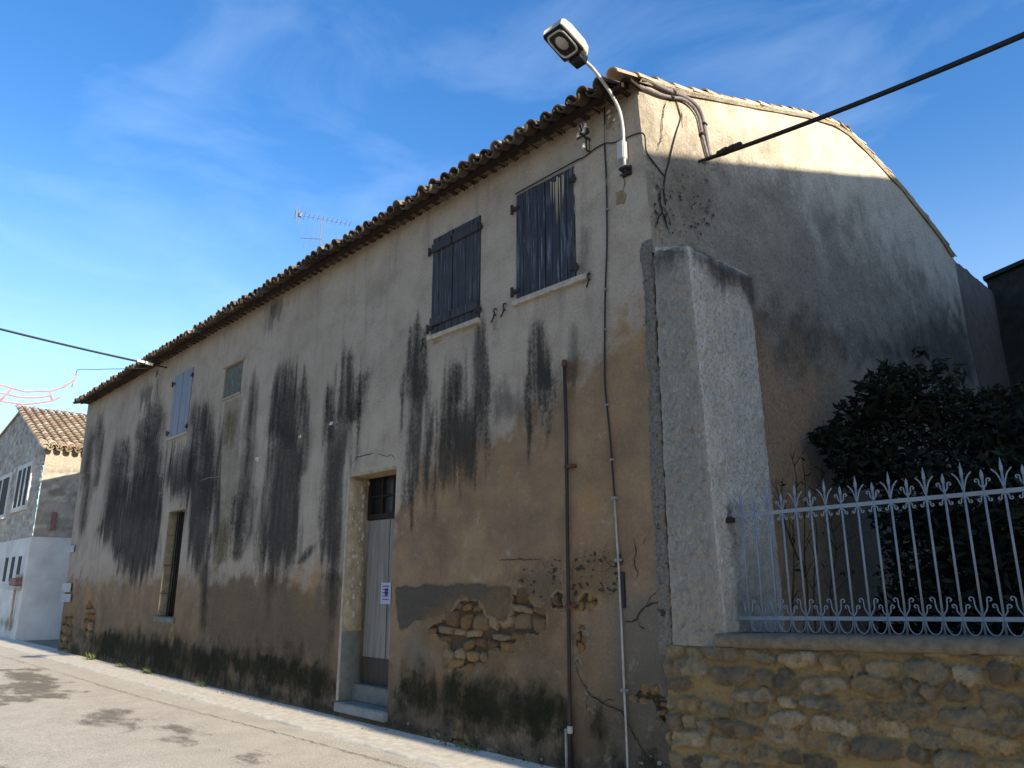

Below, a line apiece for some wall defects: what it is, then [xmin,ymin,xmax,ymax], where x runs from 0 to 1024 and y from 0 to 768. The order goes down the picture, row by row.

damp [401,322,488,500]
damp [525,323,556,435]
damp [80,356,367,709]
spalling [427,551,622,672]
crack [601,538,659,630]
damp [0,668,68,705]
crack [575,663,650,760]